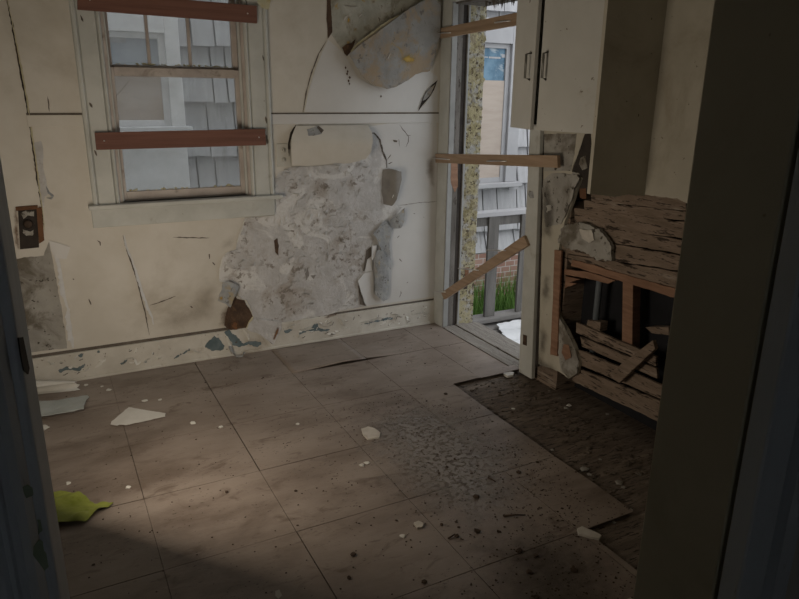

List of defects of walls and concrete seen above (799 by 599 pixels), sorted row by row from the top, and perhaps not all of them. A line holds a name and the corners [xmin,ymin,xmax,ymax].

crack [7,0,45,230]
flaking render [326,0,423,56]
flaking render [17,241,106,376]
flaking render [174,132,430,359]